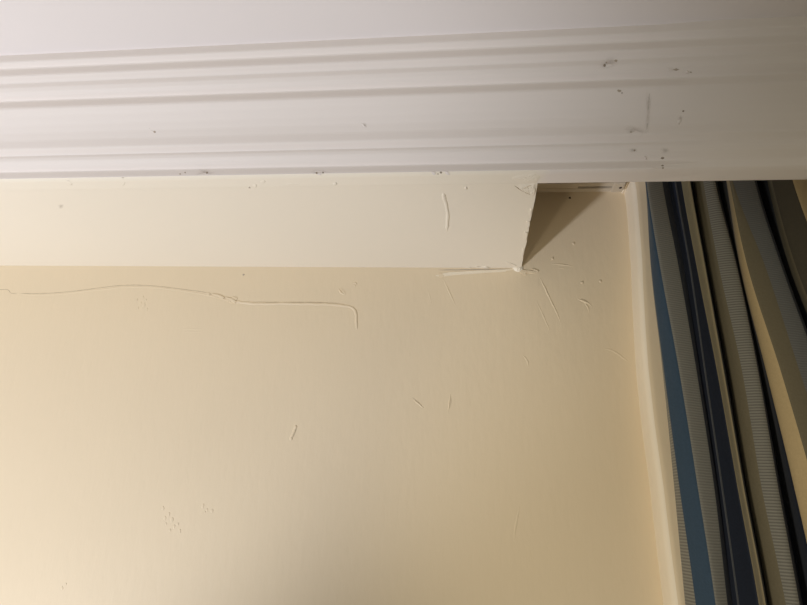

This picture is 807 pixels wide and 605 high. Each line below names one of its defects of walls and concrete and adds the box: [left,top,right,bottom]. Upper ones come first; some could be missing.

crack [0,285,358,329]